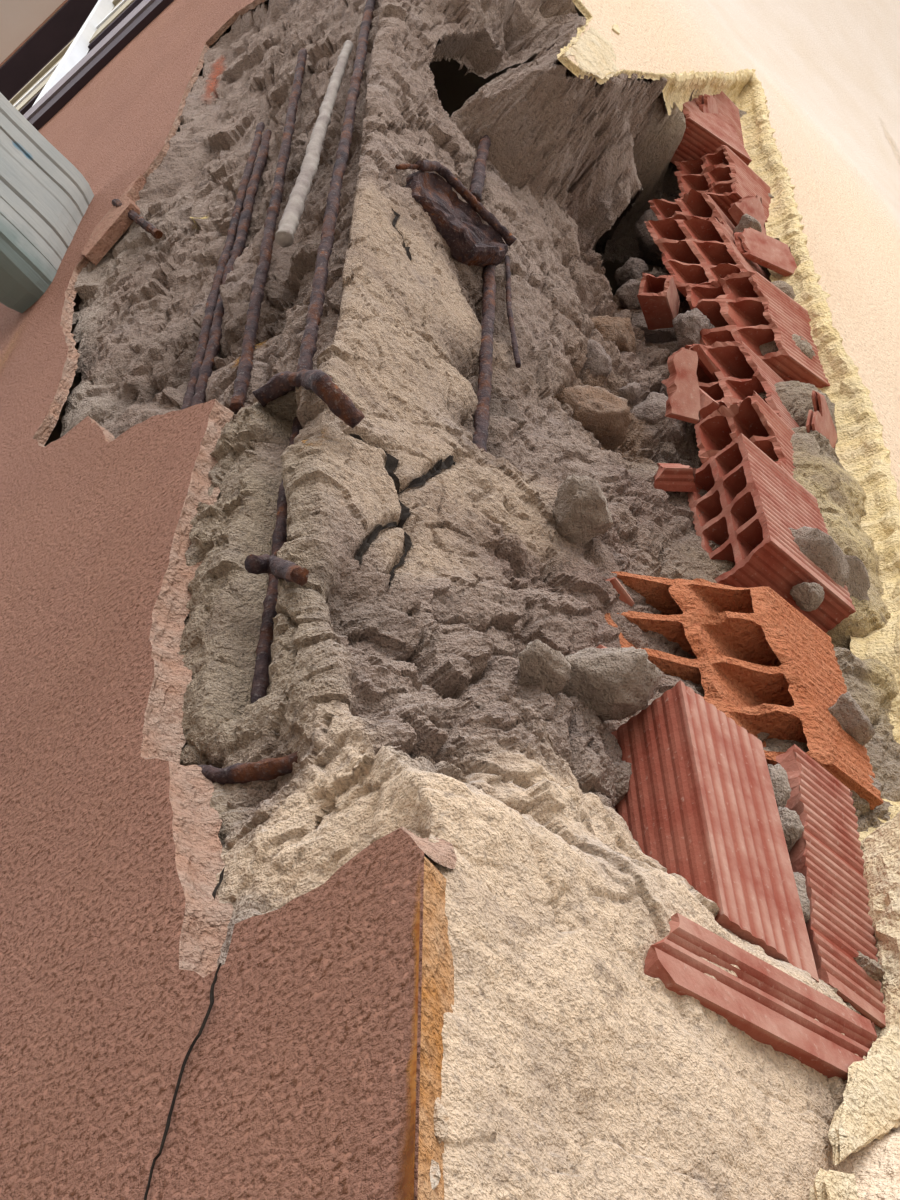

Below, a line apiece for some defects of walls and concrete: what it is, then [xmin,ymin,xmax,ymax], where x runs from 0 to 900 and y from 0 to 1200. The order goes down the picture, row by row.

crack [349,434,455,592]
spalling [33,0,900,981]
crack [144,963,222,1200]
spalling [216,704,900,1200]